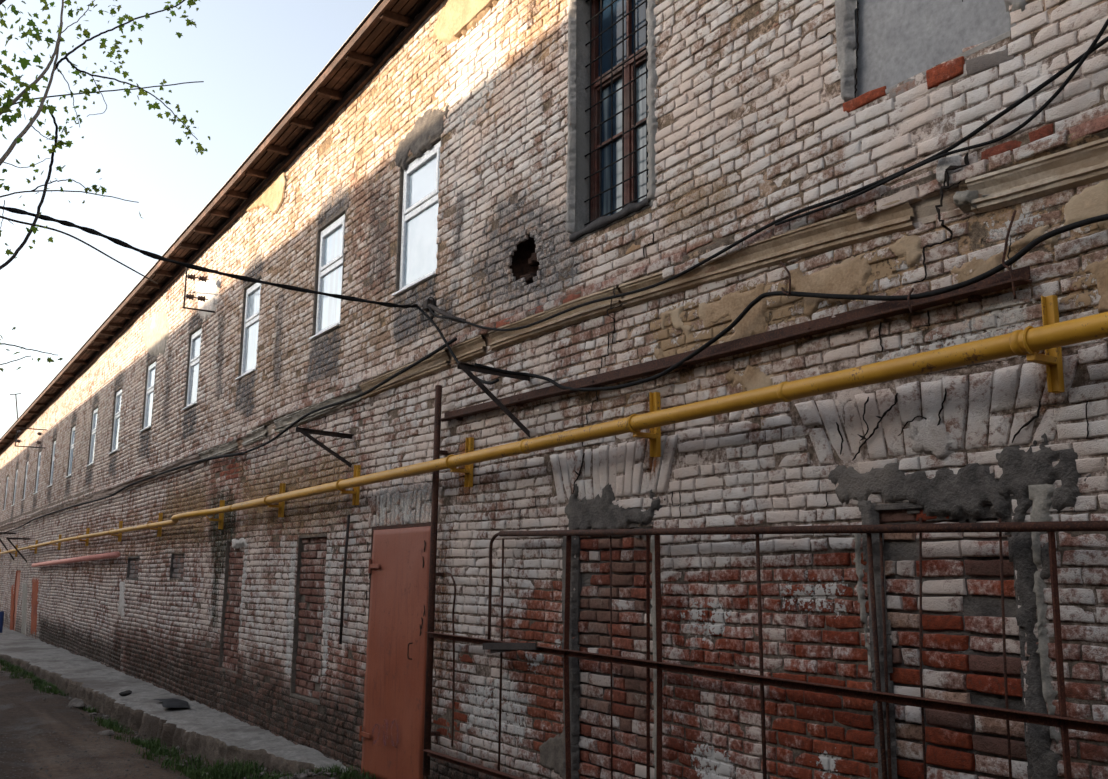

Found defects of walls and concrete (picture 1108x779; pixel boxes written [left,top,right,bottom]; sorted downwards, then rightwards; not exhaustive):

spalling [509,235,540,285]
crack [910,152,970,284]
flaking render [1056,223,1107,316]
crack [836,388,947,461]
crack [1012,401,1041,443]
damp [38,613,361,770]
peeling [433,581,575,751]
peeling [664,552,879,779]